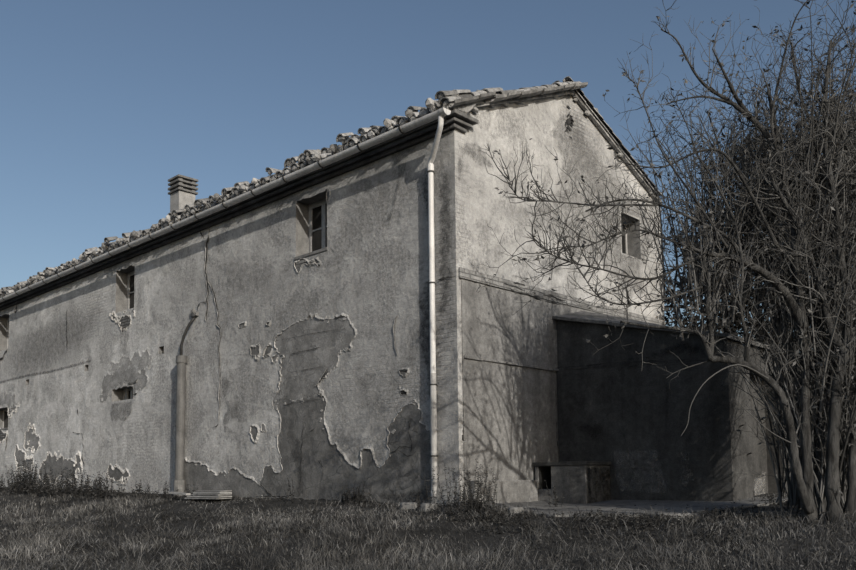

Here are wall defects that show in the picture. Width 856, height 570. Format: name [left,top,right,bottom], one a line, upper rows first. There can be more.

flaking render [0,389,20,419]
flaking render [14,423,83,485]
crack [197,228,221,427]
flaking render [184,313,433,504]